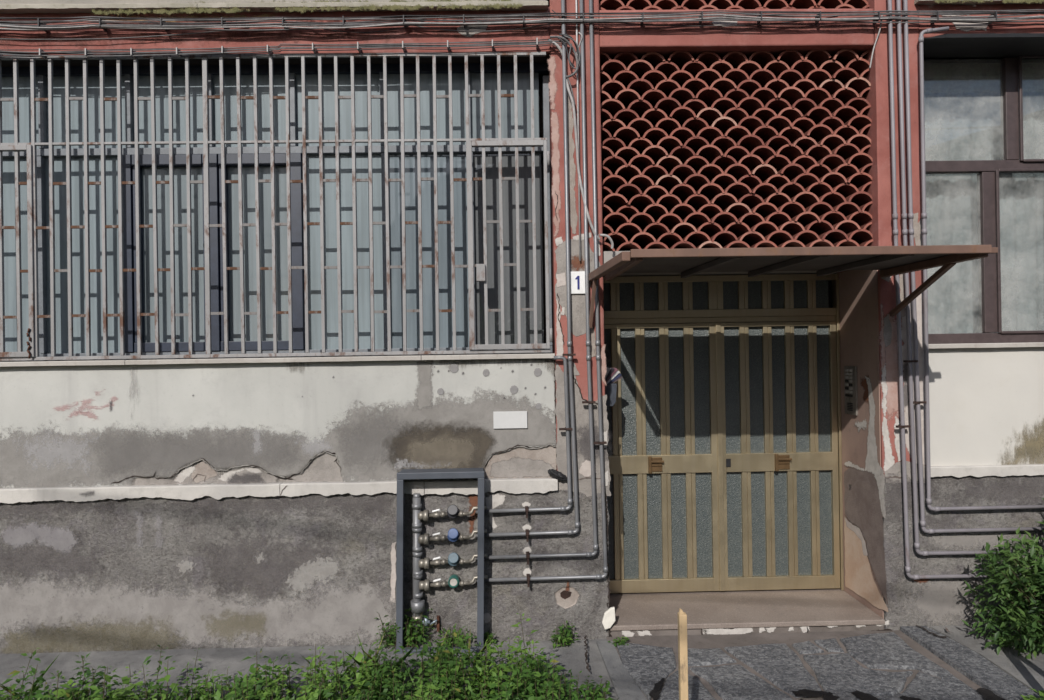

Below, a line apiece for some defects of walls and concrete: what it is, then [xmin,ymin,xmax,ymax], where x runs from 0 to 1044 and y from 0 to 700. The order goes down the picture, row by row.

peeling [913,213,922,246]
peeling [484,55,611,609]
peeling [111,451,343,486]
peeling [844,271,934,627]
leakage [961,419,1044,505]
leakage [0,360,556,648]
leakage [921,511,1013,551]
leakage [905,571,983,623]
peeling [609,629,651,637]
peeling [703,626,810,635]